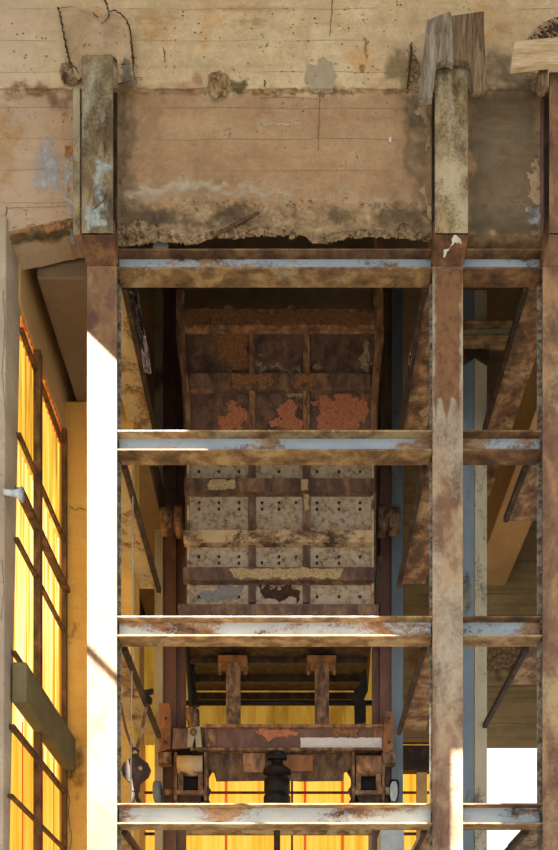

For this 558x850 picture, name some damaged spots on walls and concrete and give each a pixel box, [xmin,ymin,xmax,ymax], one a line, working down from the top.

spalling [59,62,81,84]
crack [263,80,320,150]
damp [469,57,539,239]
damp [127,181,201,226]
spalling [121,200,430,246]
peeling [526,159,541,205]
corrosion [254,729,298,741]